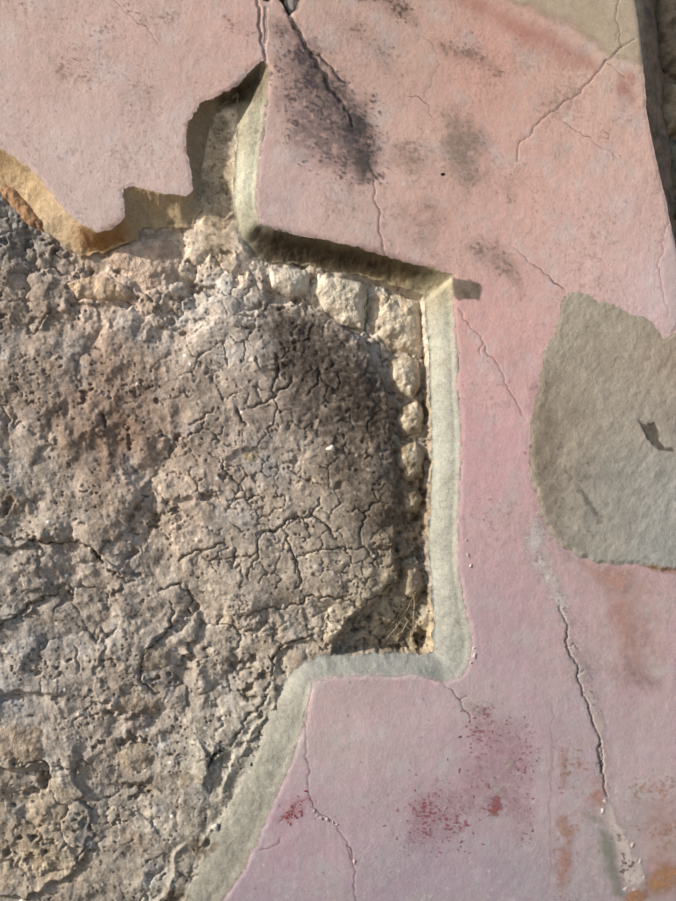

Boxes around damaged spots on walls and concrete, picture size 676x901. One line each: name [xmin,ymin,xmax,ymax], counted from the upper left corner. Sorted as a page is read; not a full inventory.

leakage [222,25,388,185]
crack [517,0,635,162]
crack [0,533,134,583]
crack [140,583,193,694]
leakage [164,291,254,343]
flaking render [0,61,484,901]
crack [237,357,292,424]
crack [179,504,394,613]
leakage [276,320,393,524]
crack [562,615,607,795]
flaking render [522,292,676,628]
peeling [470,777,509,820]